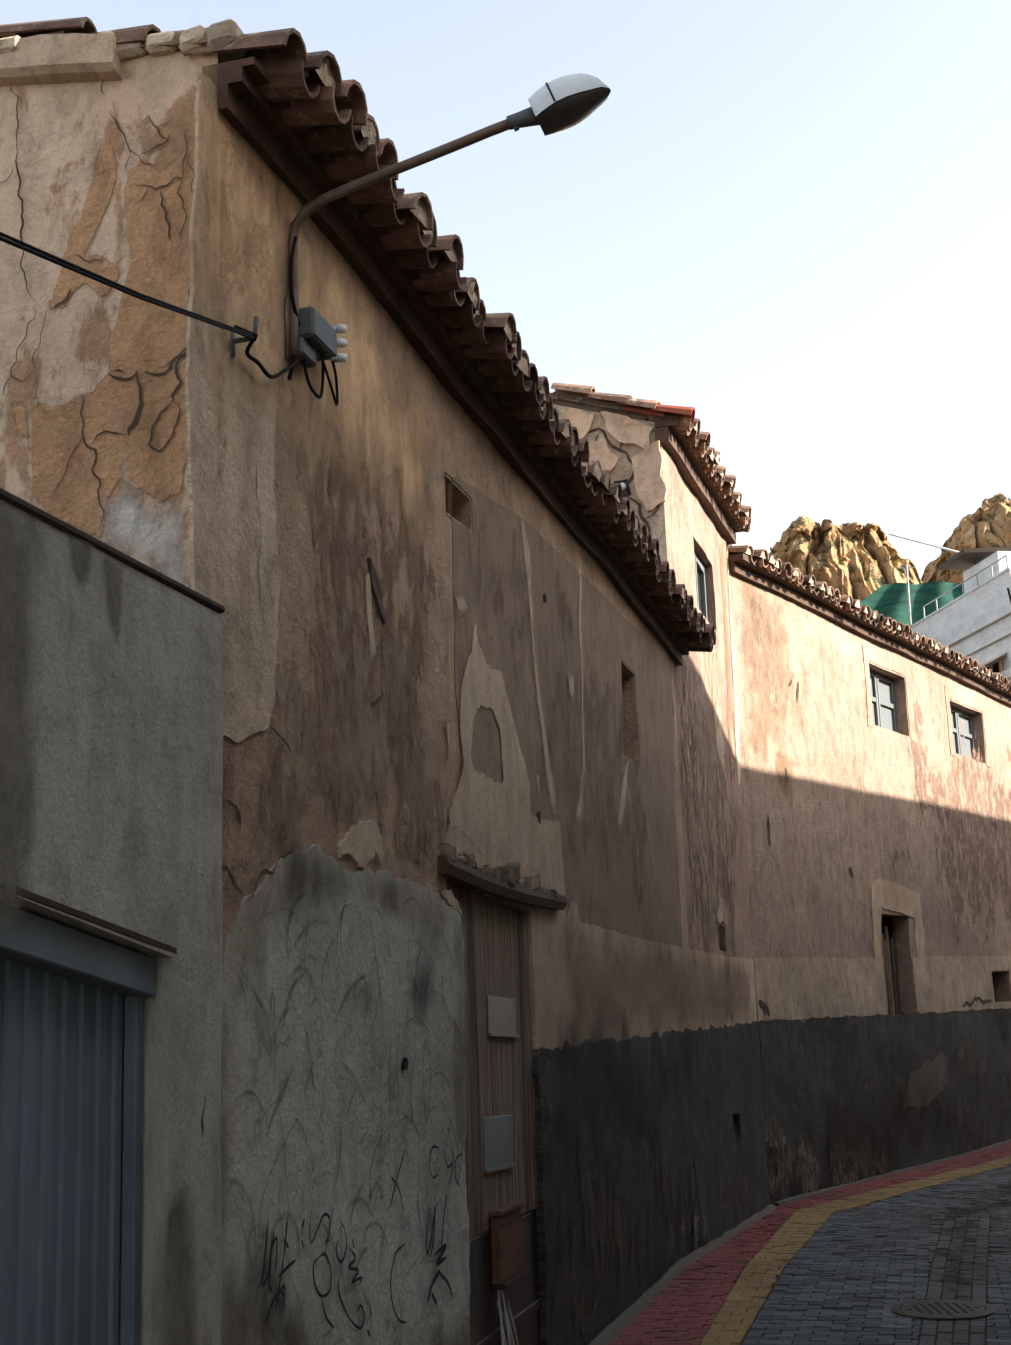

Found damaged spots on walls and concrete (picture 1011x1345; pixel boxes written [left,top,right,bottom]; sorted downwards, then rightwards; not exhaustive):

crack [100,79,194,242]
crack [0,84,71,407]
flaking render [220,175,277,325]
flaking render [0,86,197,580]
crack [51,347,186,533]
flaking render [559,408,668,512]
leakage [72,537,121,633]
leakage [109,497,180,581]
flaking render [903,1053,948,1110]
leakage [157,1200,192,1345]